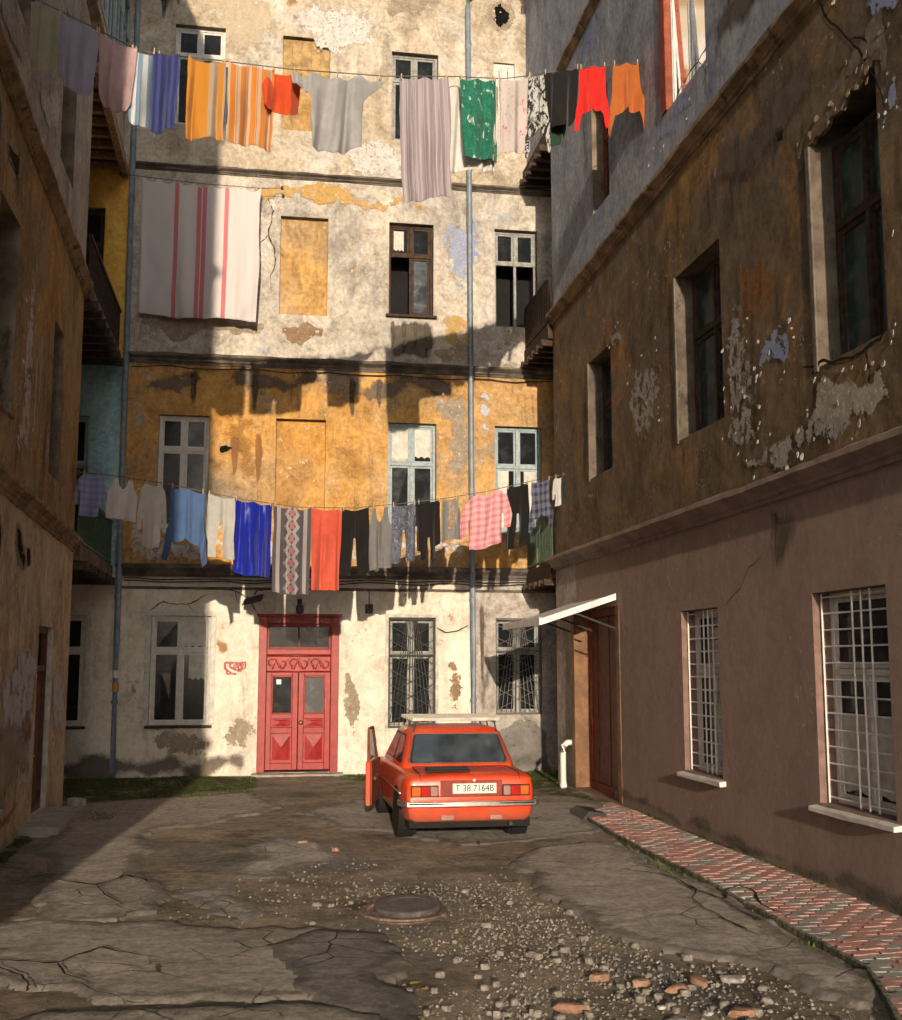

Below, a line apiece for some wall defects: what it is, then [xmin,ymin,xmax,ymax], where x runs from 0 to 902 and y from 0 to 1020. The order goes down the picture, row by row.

flaking render [291,2,378,71]
crack [819,1,885,109]
flaking render [822,0,899,129]
flaking render [255,133,482,294]
flaking render [15,262,43,460]
water stain [149,372,200,401]
water stain [233,367,318,408]
water stain [349,375,452,415]
flaking render [627,349,660,439]
flaking render [721,304,889,480]
flaking render [1,645,37,786]
water stain [64,754,243,779]